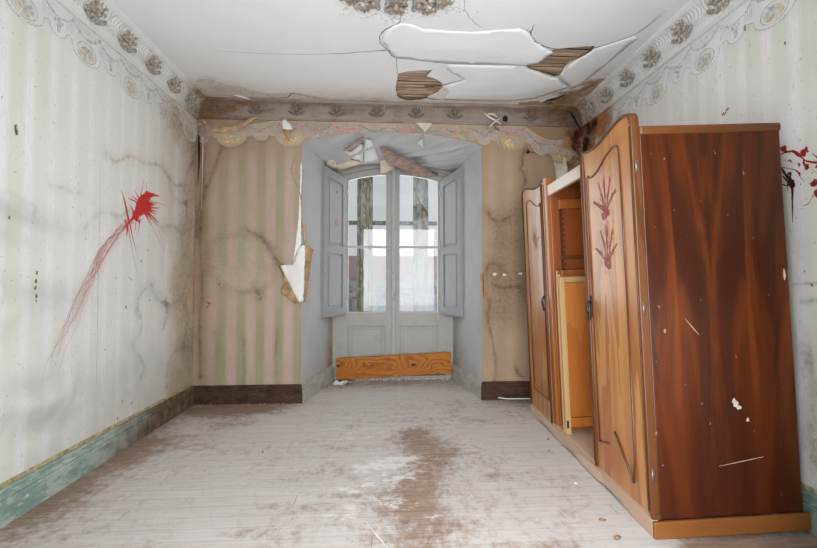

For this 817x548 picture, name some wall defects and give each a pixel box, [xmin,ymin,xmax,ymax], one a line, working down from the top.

crack [336,16,484,75]
peeling [383,23,638,101]
crack [558,77,581,130]